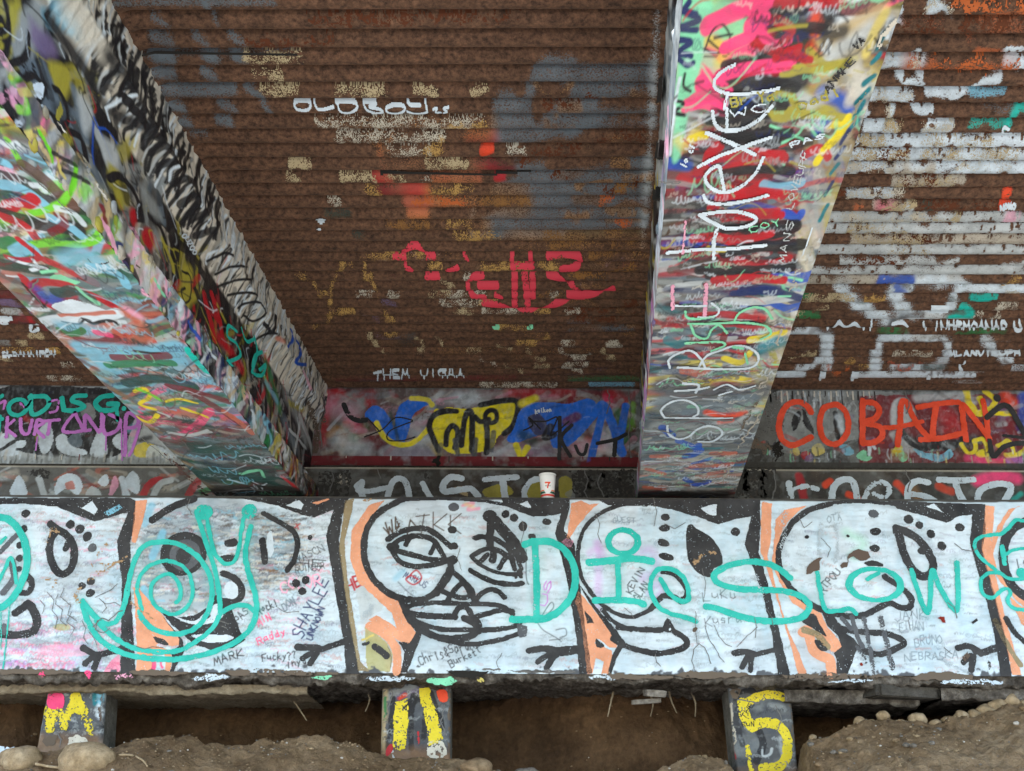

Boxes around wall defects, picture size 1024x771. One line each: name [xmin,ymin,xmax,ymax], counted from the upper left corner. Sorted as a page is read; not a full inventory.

rust [951,0,1024,34]
rust [242,9,521,48]
rust [931,52,1021,77]
rust [874,147,911,161]
rust [902,174,1000,211]
rust [411,195,468,208]
rust [892,234,932,245]
rust [852,255,897,266]
spalling [225,668,338,676]